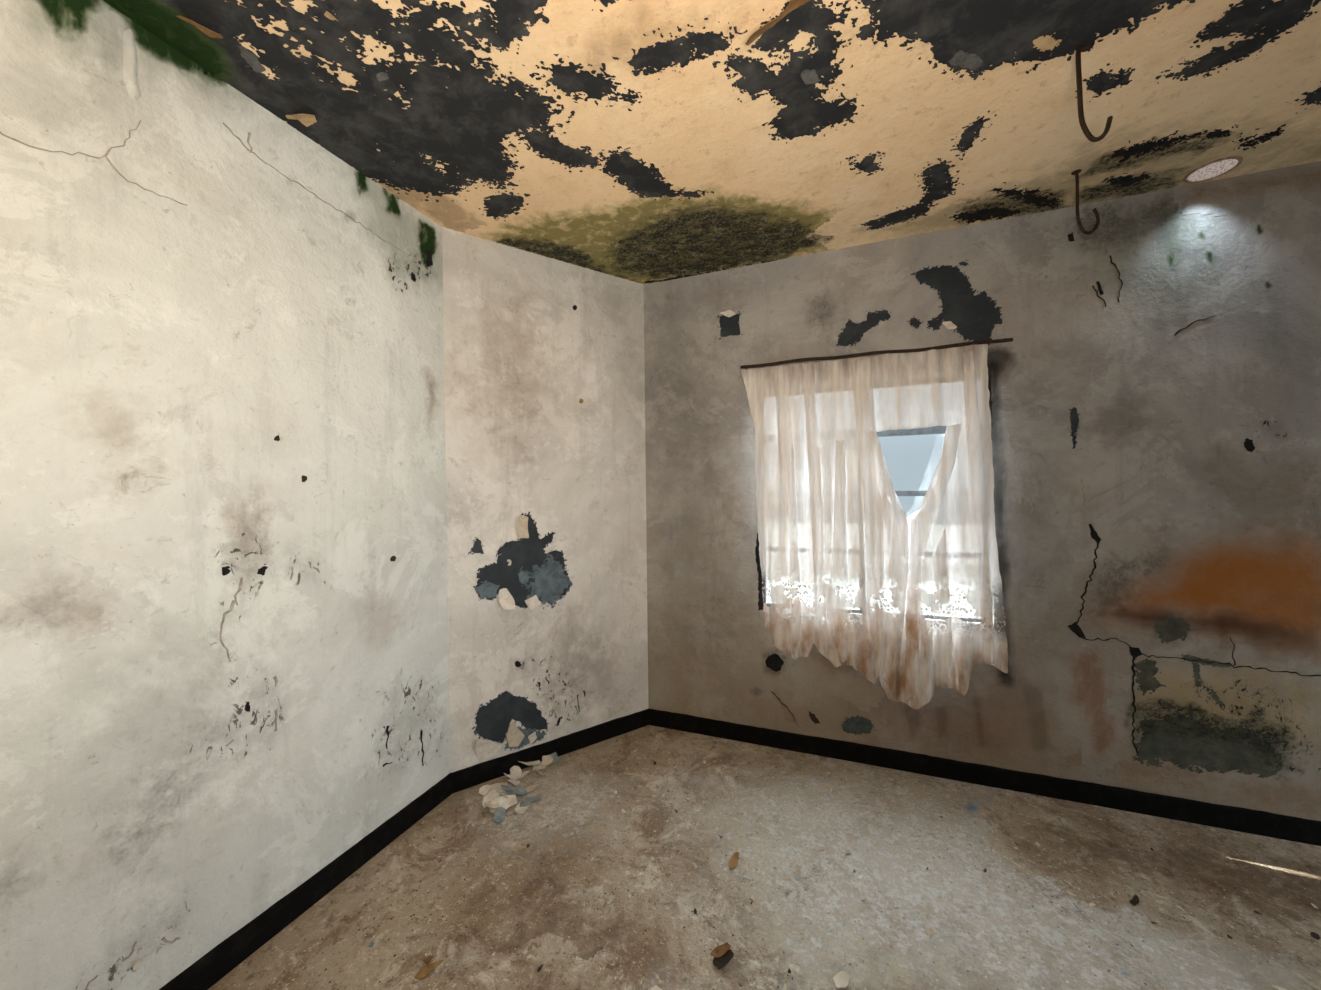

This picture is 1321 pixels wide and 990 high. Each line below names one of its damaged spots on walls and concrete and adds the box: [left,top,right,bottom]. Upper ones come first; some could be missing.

peeling [1155,0,1321,84]
peeling [155,0,1195,230]
peeling [1286,81,1321,114]
damp [356,77,1321,292]
peeling [837,308,891,347]
peeling [907,260,1005,345]
damp [1092,255,1123,307]
peeling [468,512,573,610]
rust [1054,496,1321,773]
crack [1067,479,1321,753]
peeling [472,656,586,760]
damp [1035,642,1321,821]